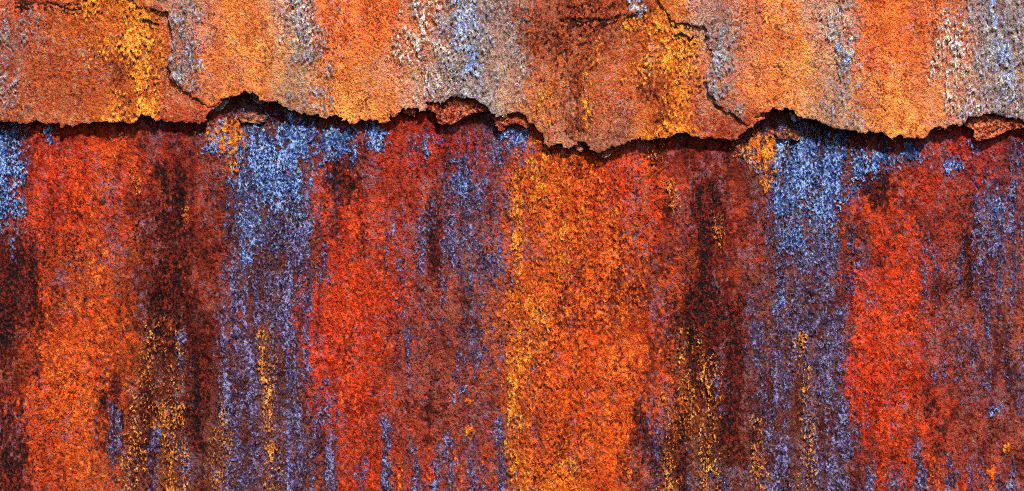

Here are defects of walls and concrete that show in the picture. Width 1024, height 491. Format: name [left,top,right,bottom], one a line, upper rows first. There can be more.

crack [674,32,699,44]
corrosion [0,132,233,491]
corrosion [206,112,266,172]
corrosion [256,321,283,491]
corrosion [302,146,401,491]
corrosion [417,195,444,278]
corrosion [652,383,700,491]
corrosion [683,177,748,491]
corrosion [747,415,772,491]
corrosion [733,128,801,192]
corrosion [792,331,819,490]
corrosion [841,164,944,491]